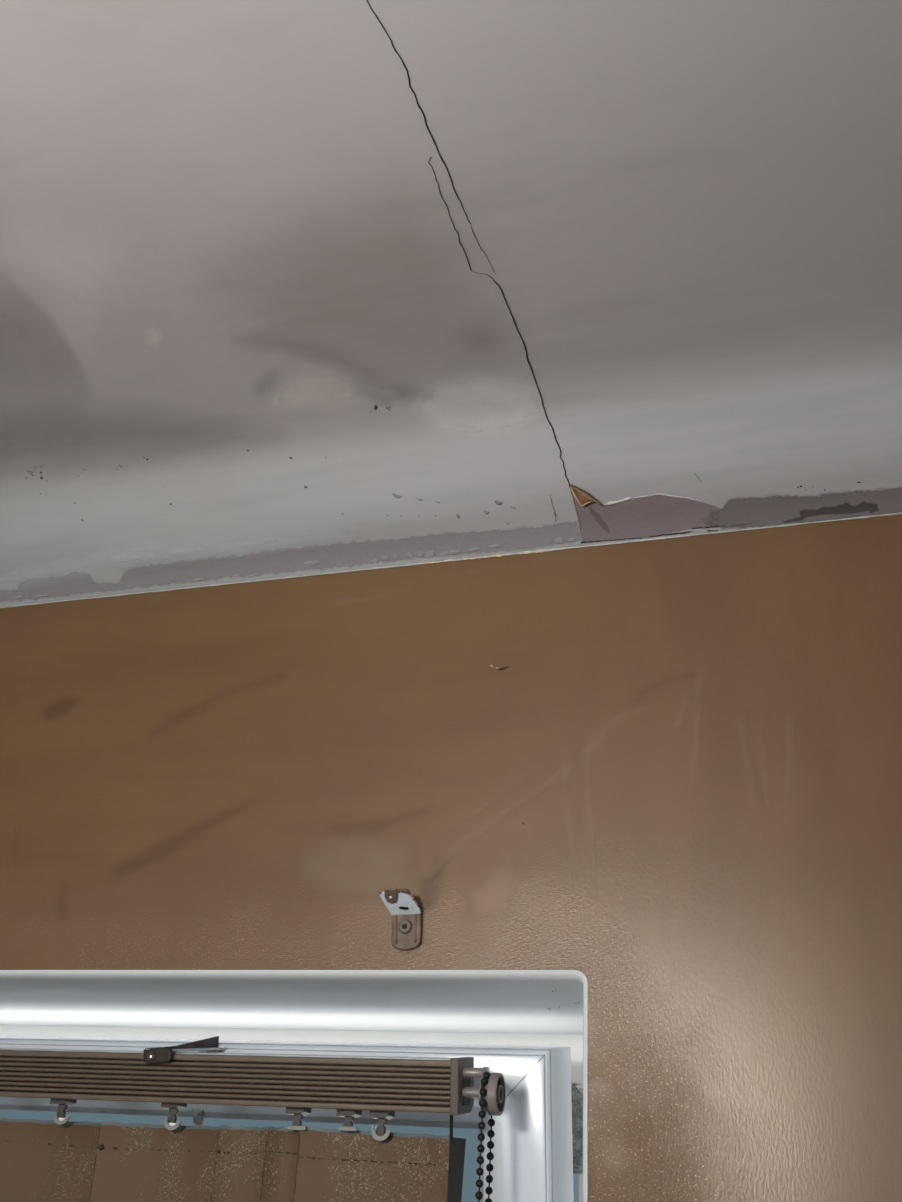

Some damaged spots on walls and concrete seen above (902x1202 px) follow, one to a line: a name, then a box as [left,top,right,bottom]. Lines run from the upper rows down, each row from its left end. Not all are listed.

crack [366,0,581,532]
peeling [0,487,902,602]